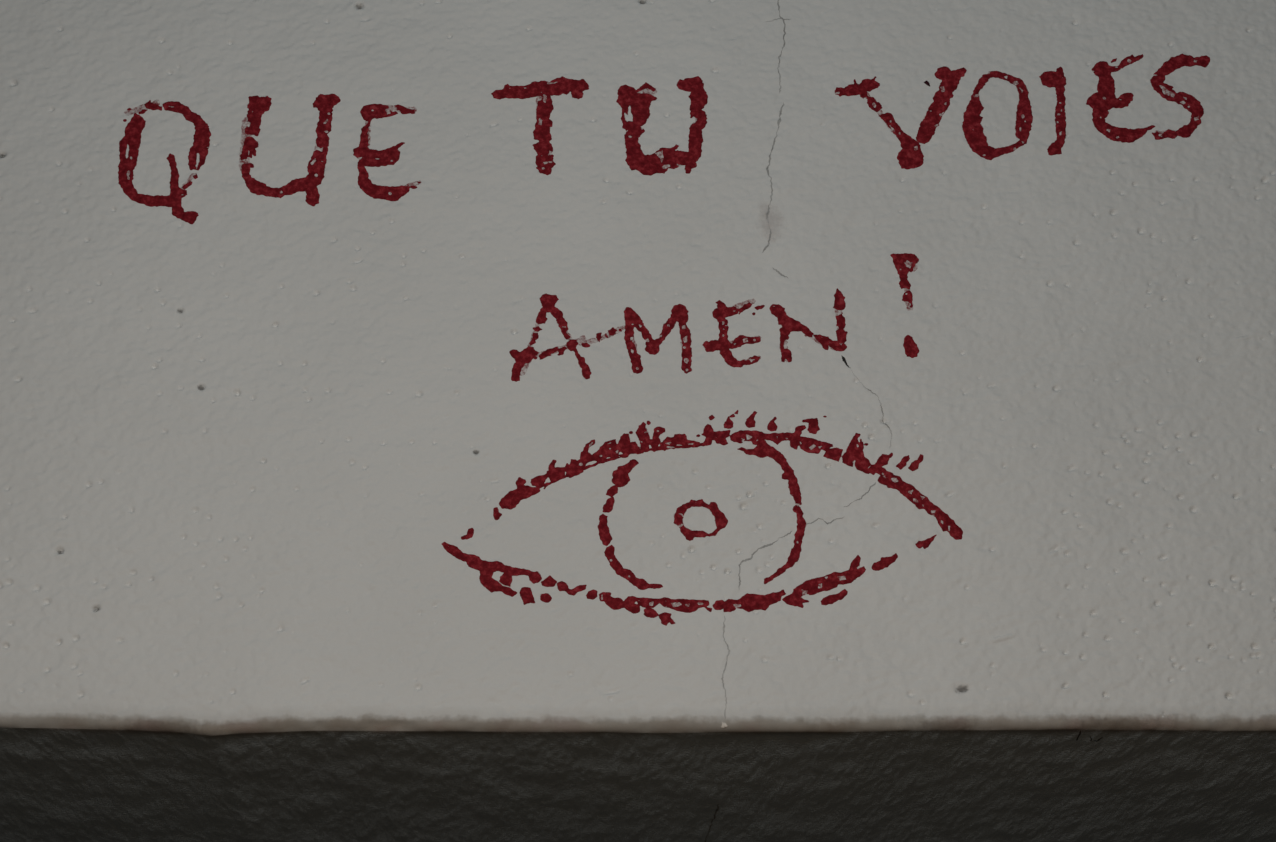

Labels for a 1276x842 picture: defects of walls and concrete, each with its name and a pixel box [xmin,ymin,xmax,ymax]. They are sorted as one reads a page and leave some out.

crack [762,0,789,278]
crack [842,356,892,445]
crack [738,482,876,587]
crack [721,616,730,718]